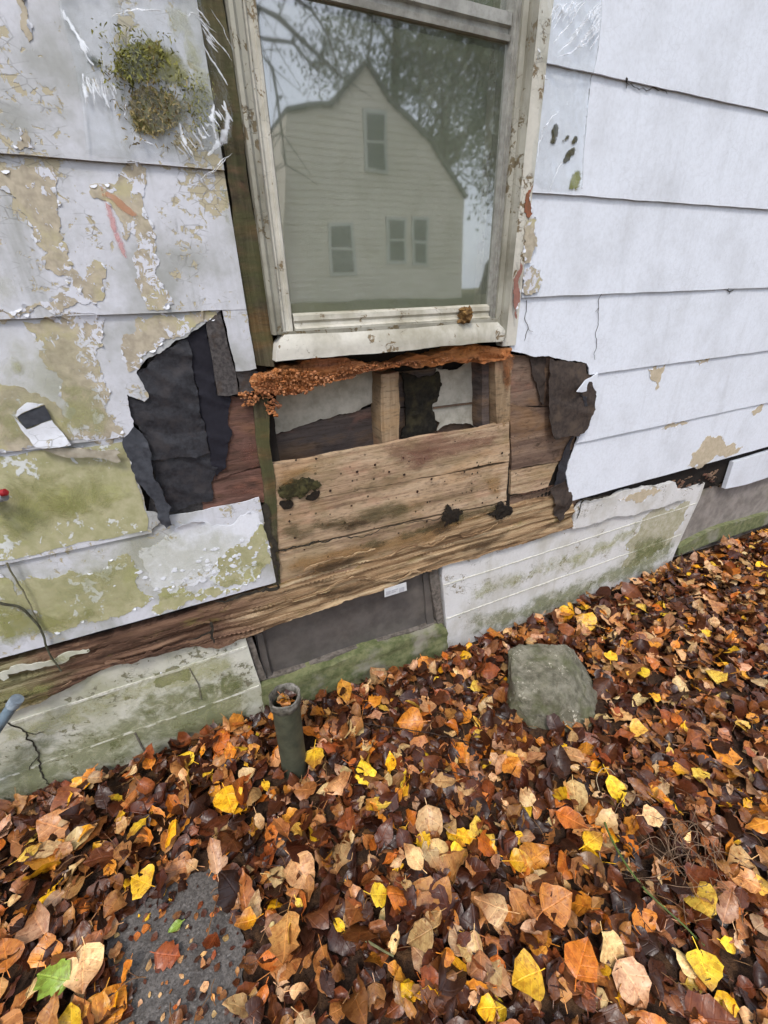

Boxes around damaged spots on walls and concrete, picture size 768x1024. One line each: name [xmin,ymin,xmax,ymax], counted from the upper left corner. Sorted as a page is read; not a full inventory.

peeling [16,0,33,42]
peeling [89,160,217,372]
peeling [513,186,543,319]
crack [594,294,602,358]
spalling [238,346,465,424]
damp [315,540,381,572]
damp [283,505,422,539]
damp [452,535,503,554]
damp [636,538,662,556]
spalling [618,436,743,569]
damp [146,677,238,706]
crack [7,722,49,785]